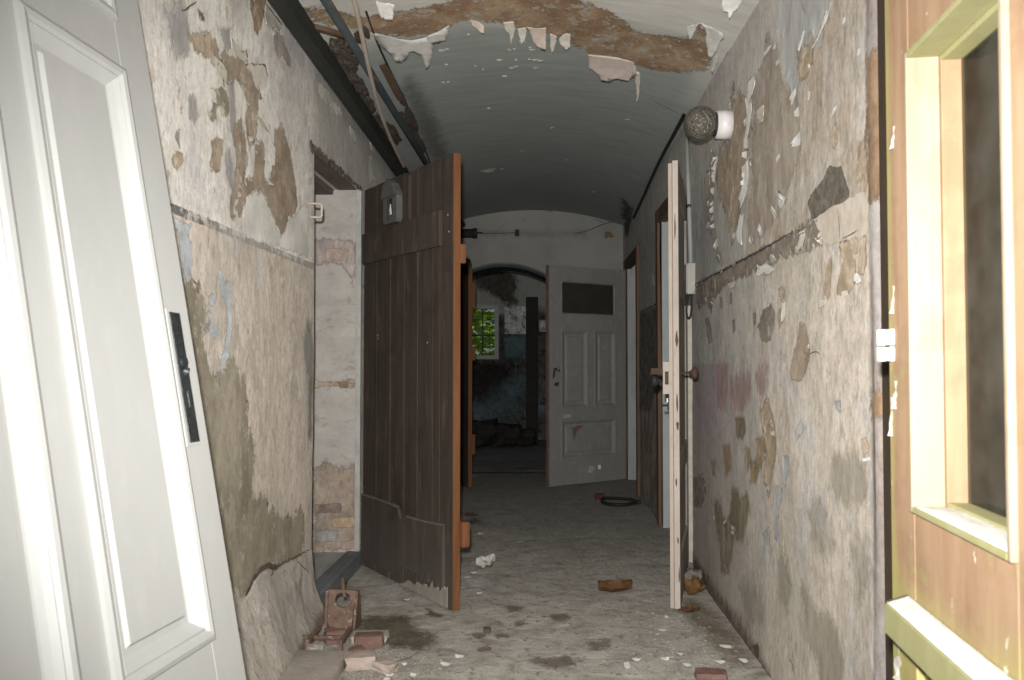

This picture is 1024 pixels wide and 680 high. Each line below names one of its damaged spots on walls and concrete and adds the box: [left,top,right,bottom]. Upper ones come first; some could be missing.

peeling [172,129,183,172]
peeling [187,0,298,236]
peeling [303,0,724,153]
peeling [694,0,869,345]
leakage [305,324,313,436]
flaking render [790,322,820,382]
peeling [693,474,706,507]
peeling [759,398,789,574]
crack [245,550,310,596]